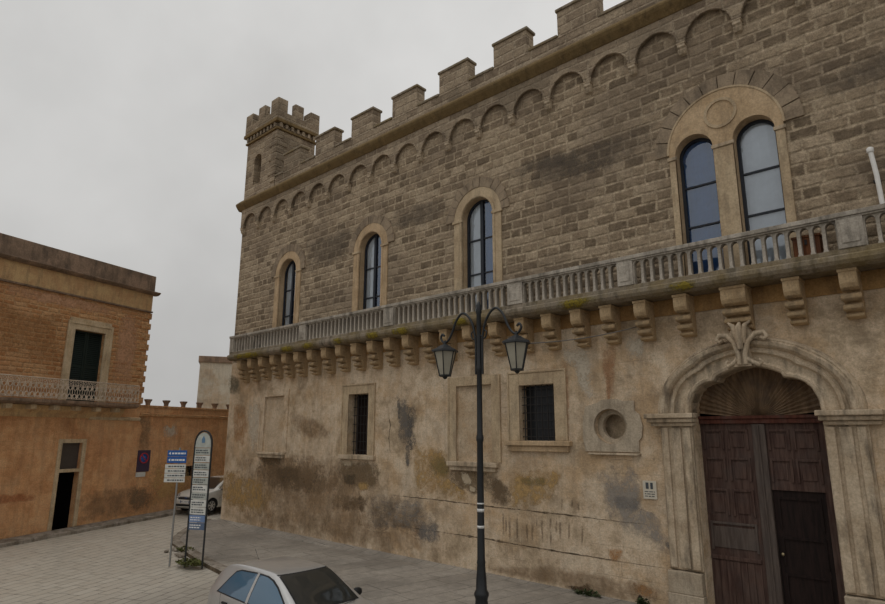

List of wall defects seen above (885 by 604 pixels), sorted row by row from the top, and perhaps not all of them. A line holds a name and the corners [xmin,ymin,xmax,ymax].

water stain [397,401,465,499]
water stain [222,458,393,545]